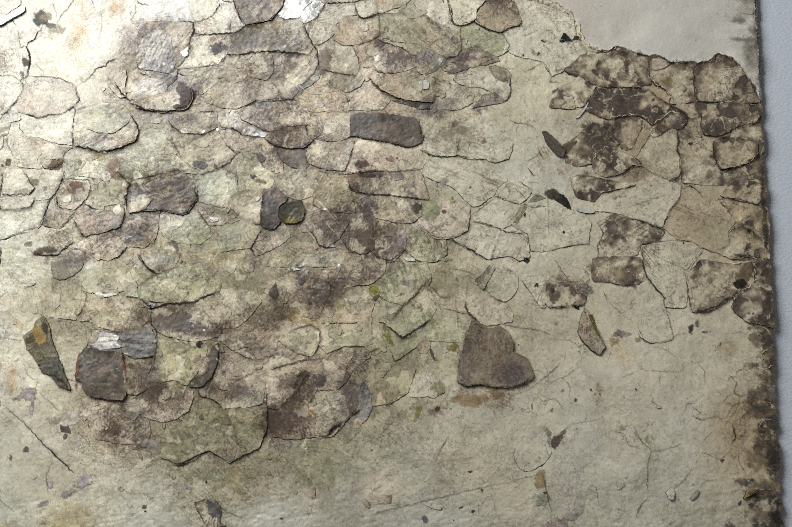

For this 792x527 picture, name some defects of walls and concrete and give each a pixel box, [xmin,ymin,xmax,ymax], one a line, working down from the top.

crack [174,0,413,108]
crack [442,0,757,114]
water stain [617,51,641,81]
crack [0,172,96,260]
crack [0,29,312,230]
peeling [0,0,768,261]
peeling [22,112,775,464]
water stain [613,259,643,287]
water stain [747,111,769,249]
peeling [12,388,37,414]
water stain [735,311,784,527]
peeling [194,487,226,527]